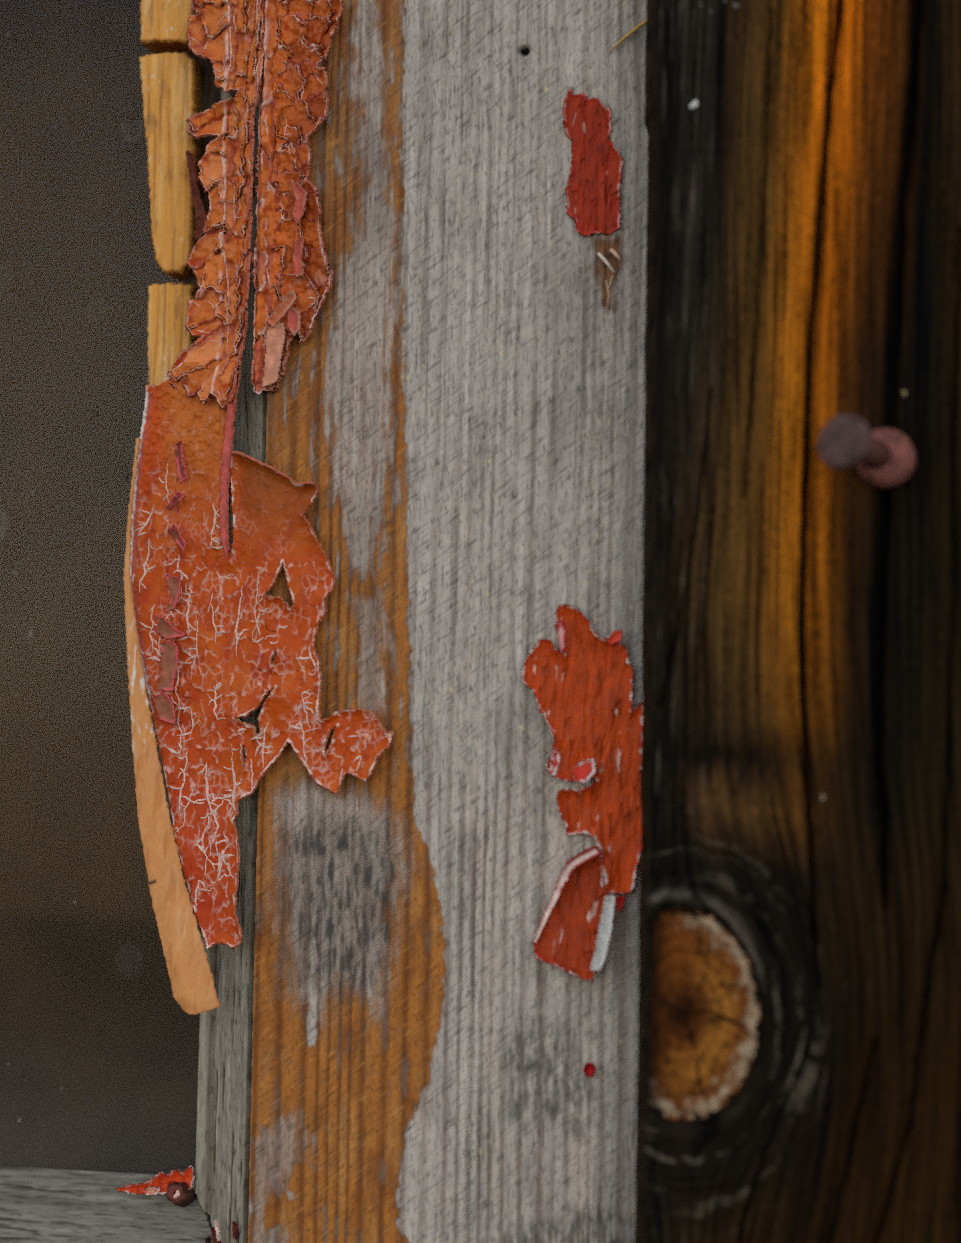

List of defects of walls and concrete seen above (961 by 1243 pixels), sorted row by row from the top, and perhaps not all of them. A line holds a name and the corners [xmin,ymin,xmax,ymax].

peeling [562,87,623,310]
peeling [123,0,394,1015]
peeling [521,603,643,981]
peeling [115,1166,197,1207]